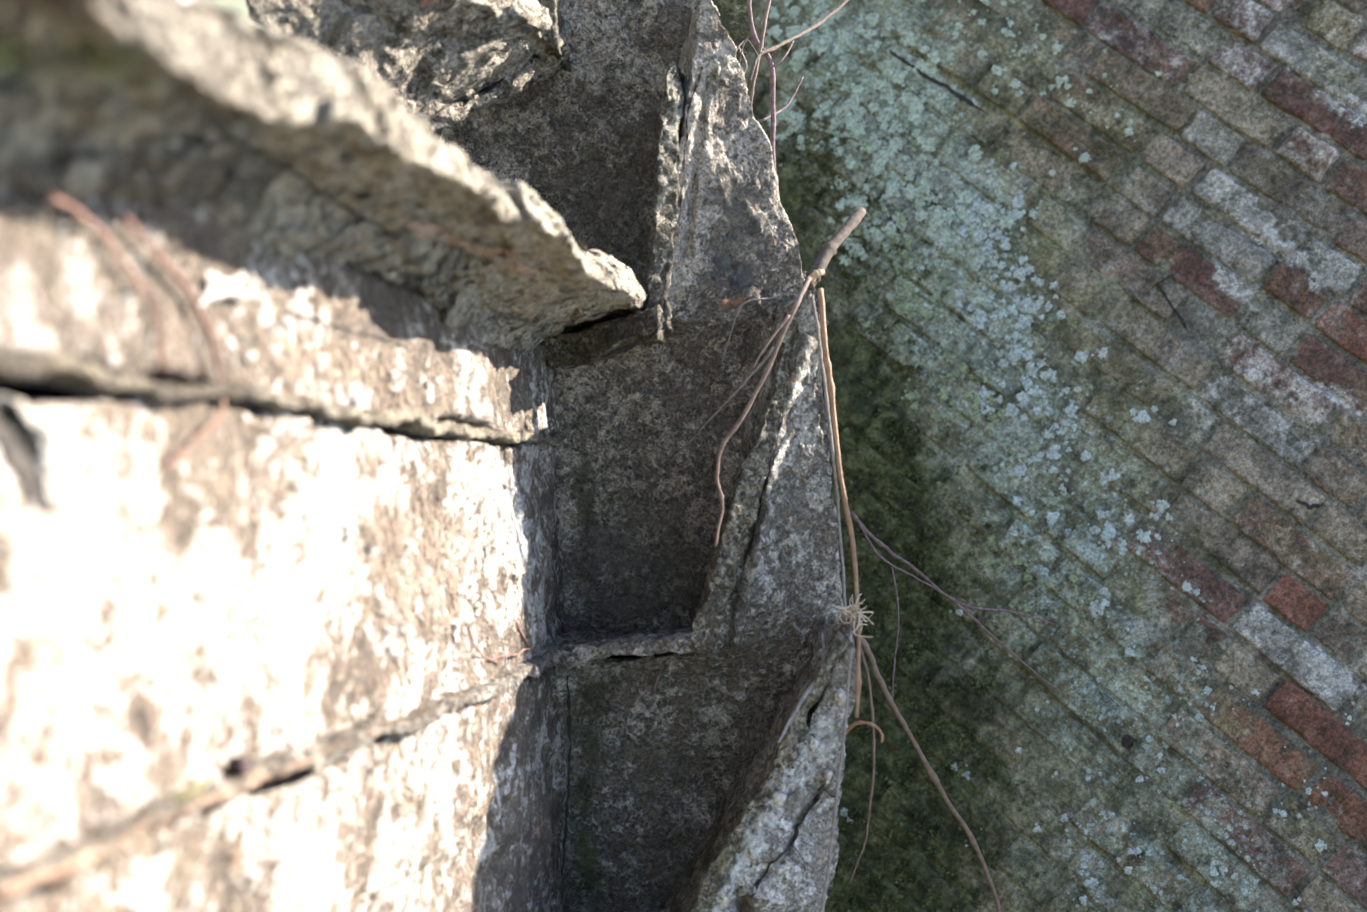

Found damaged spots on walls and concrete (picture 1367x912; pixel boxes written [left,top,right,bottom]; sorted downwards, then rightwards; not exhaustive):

crack [751,785,839,897]